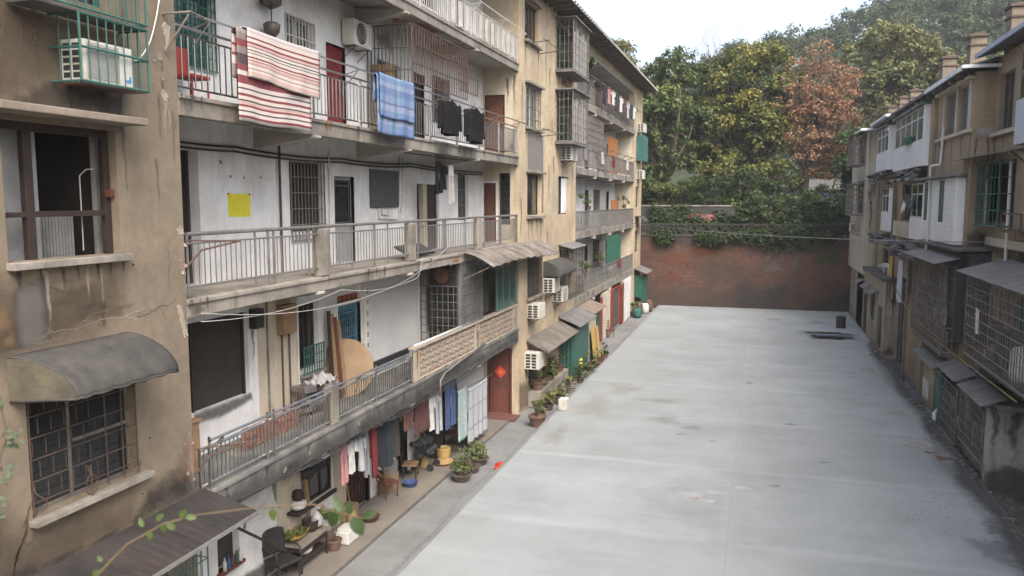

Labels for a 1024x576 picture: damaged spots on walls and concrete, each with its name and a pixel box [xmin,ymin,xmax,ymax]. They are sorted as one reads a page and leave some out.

peeling [153,22,171,102]
crack [4,240,176,344]
leakage [991,408,1024,448]
leakage [985,469,1024,493]